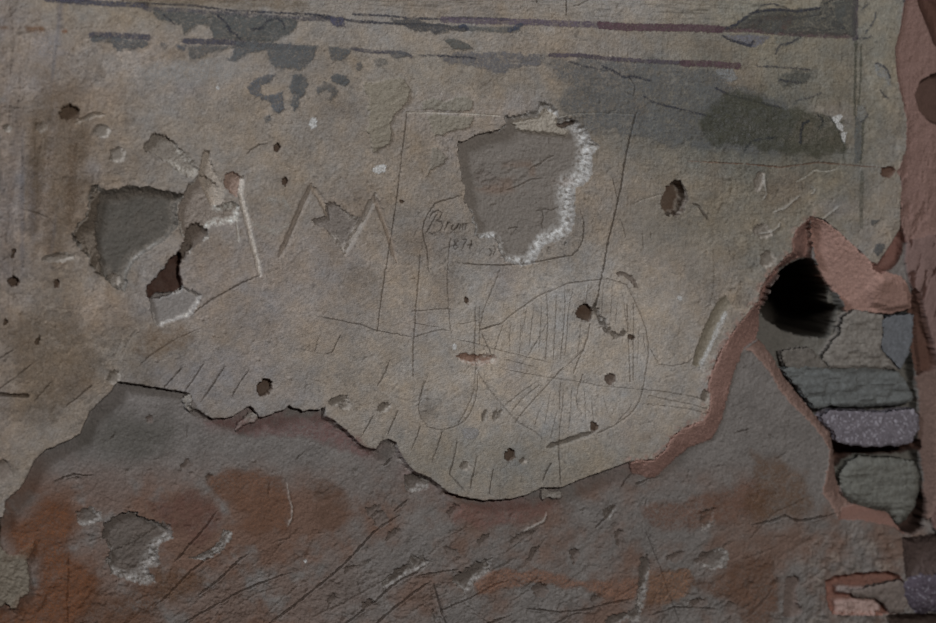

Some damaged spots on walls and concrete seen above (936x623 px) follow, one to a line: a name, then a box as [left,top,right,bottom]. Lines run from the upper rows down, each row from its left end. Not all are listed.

spalling [895,0,936,242]
flaking render [457,101,600,266]
spalling [88,184,185,293]
peeling [146,251,202,327]
hole [760,259,838,339]
spalling [191,408,207,423]
spalling [321,407,429,494]
spalling [106,511,174,586]
spalling [193,530,232,561]
spalling [381,554,433,588]
spalling [452,557,493,594]
spalling [618,566,651,623]